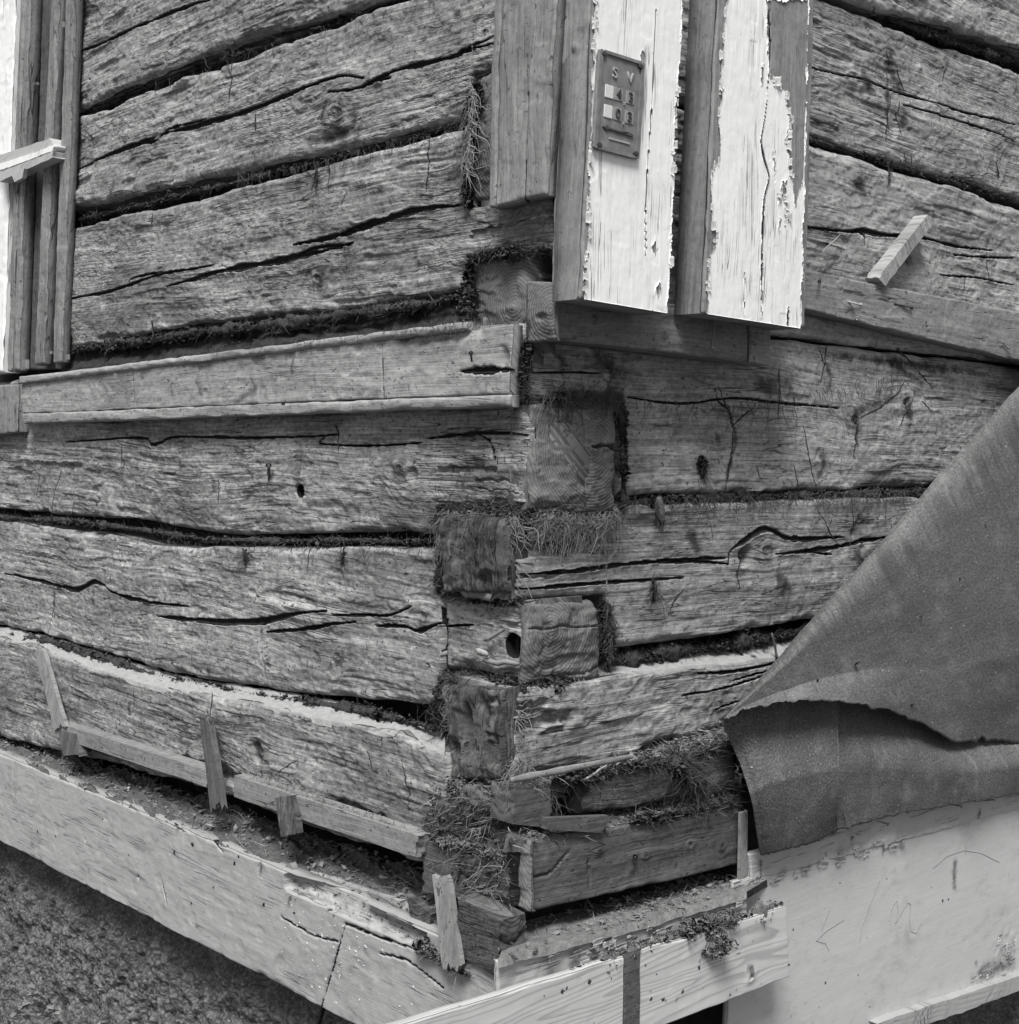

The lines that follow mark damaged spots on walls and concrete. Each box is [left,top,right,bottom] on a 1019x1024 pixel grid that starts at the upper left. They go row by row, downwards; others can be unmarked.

peeling [591,0,599,50]
crack [77,36,494,171]
peeling [671,87,681,176]
peeling [772,76,795,226]
crack [812,68,1014,140]
crack [72,204,464,299]
peeling [585,196,593,239]
crack [69,425,528,460]
crack [515,526,886,589]
crack [5,573,474,674]
crack [683,661,775,710]
crack [282,917,444,1024]